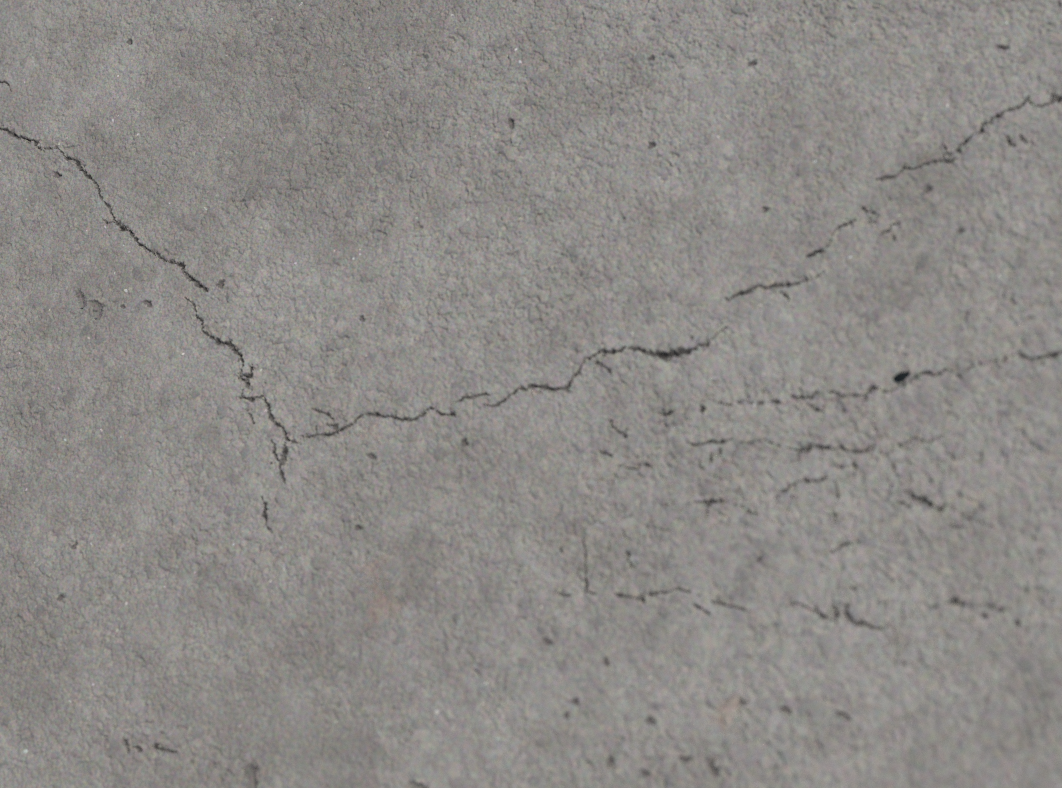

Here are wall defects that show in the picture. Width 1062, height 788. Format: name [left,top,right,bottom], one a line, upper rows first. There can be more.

crack [876,92,1062,182]
crack [0,127,899,533]
crack [657,351,1062,417]
crack [687,434,993,529]